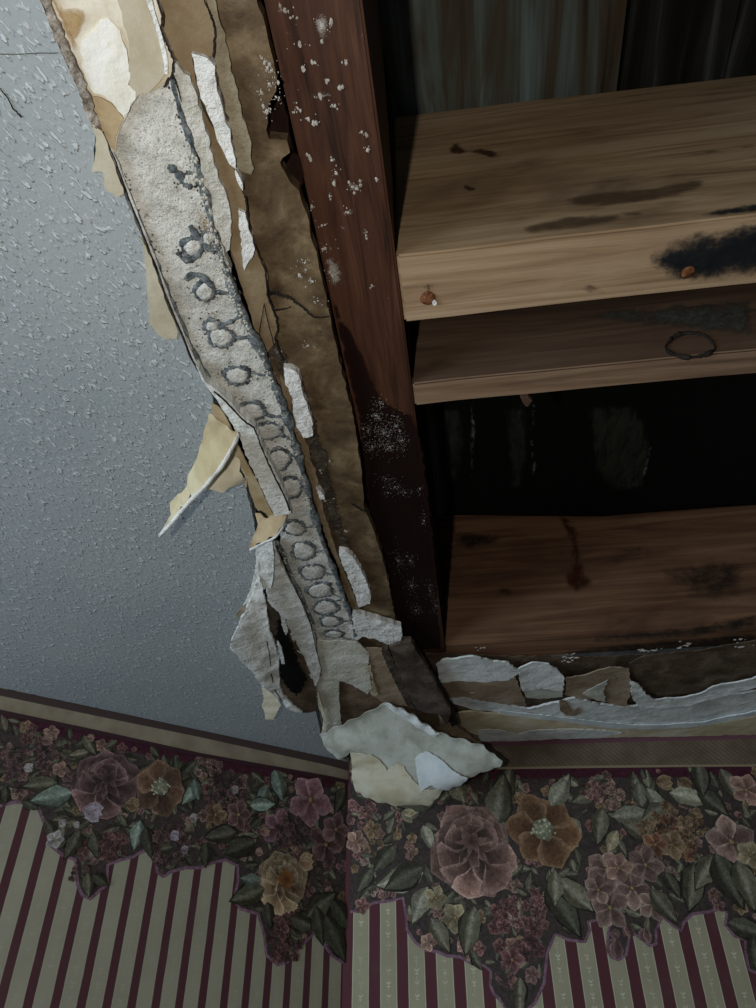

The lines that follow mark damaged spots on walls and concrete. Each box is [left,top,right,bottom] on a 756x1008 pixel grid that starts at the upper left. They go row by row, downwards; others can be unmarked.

spalling [40,0,402,644]
peeling [436,655,520,683]
peeling [449,690,756,730]